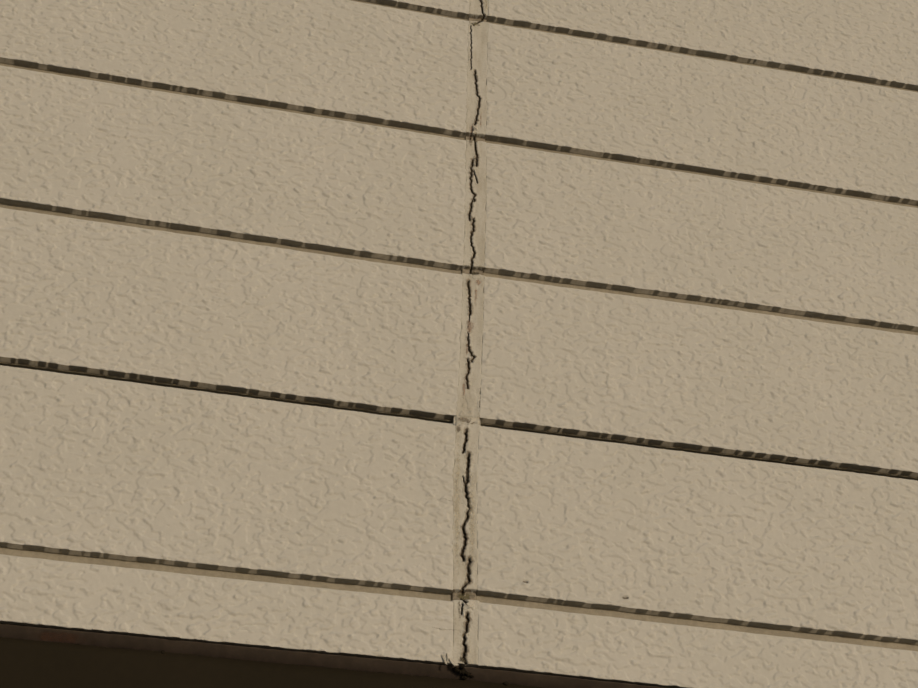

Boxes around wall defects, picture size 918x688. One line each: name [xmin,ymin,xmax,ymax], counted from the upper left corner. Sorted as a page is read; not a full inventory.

crack [465,0,485,408]
crack [433,429,473,665]